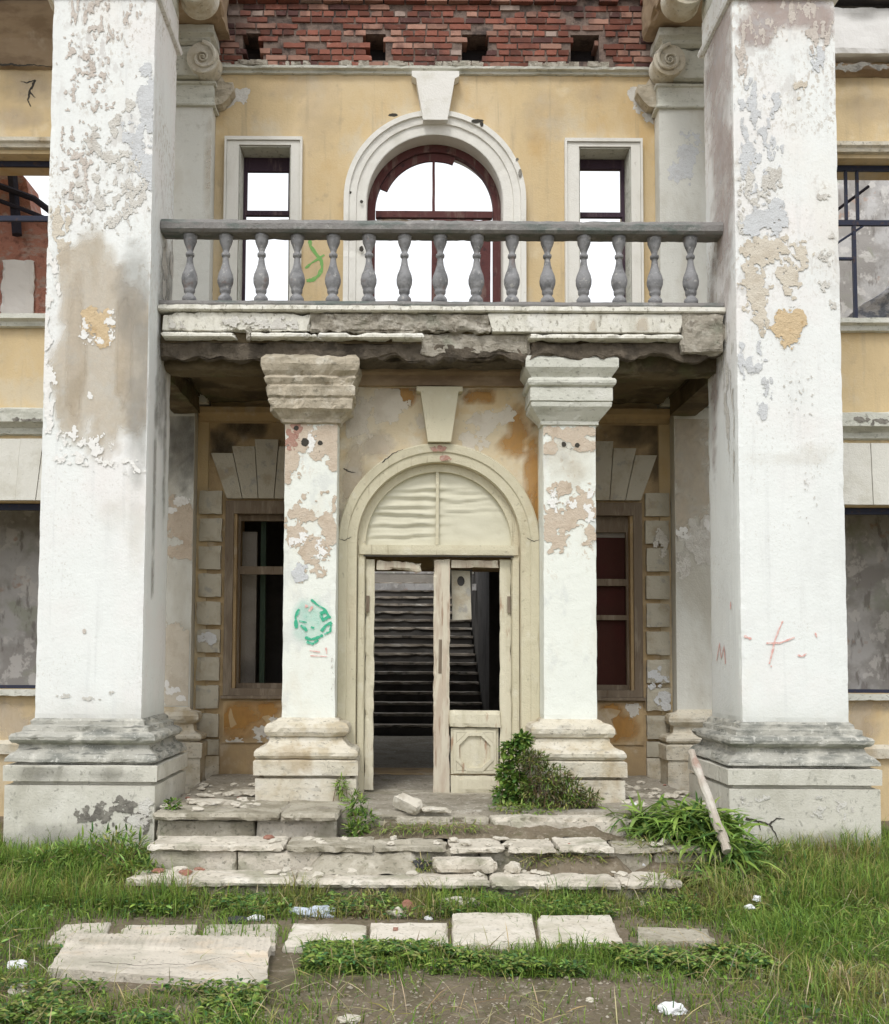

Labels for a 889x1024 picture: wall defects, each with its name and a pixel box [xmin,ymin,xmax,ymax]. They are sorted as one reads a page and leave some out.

crack [0,63,50,107]
peeling [12,0,154,480]
peeling [679,0,837,482]
peeling [222,316,299,342]
peeling [543,425,596,455]
peeling [284,490,337,583]
peeling [544,480,596,554]
spalling [74,795,154,835]